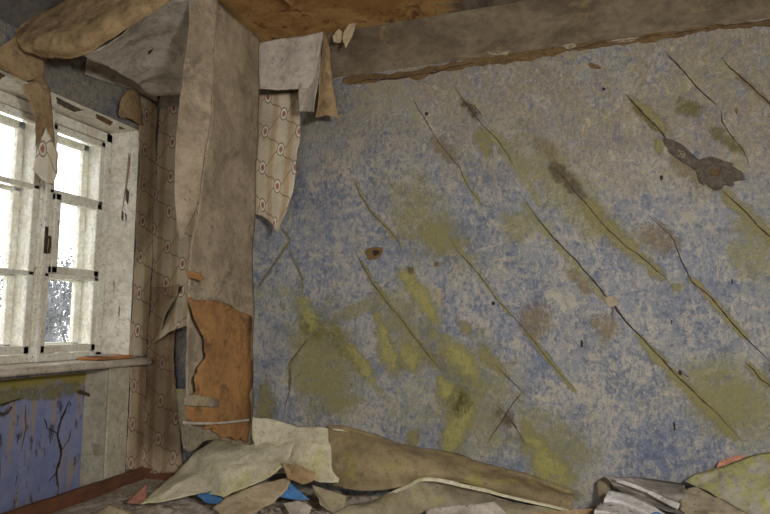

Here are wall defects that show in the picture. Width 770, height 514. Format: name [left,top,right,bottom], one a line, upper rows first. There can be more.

peeling [56,97,84,112]
peeling [121,153,131,221]
crack [410,94,481,204]
spalling [663,138,745,191]
crack [665,52,748,162]
crack [723,59,770,118]
flaking render [365,247,383,260]
crack [450,86,770,440]
water stain [292,297,589,489]
crack [44,400,71,490]